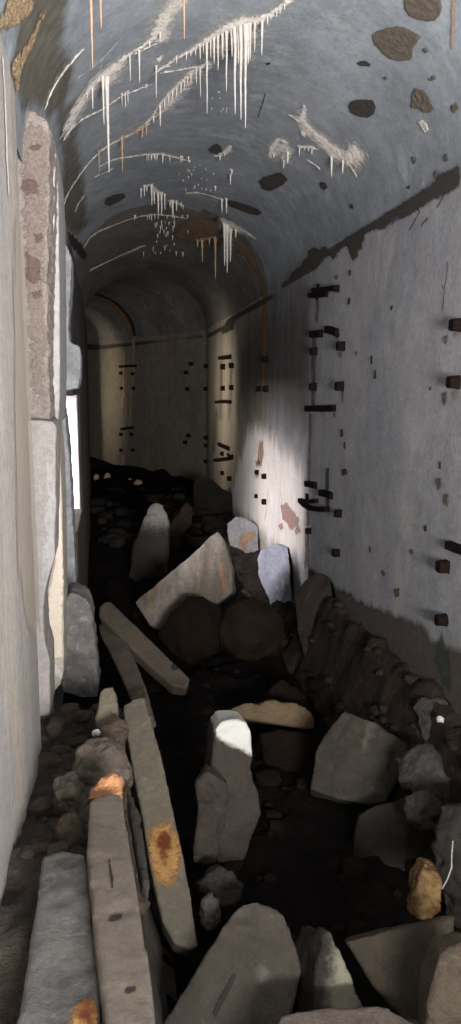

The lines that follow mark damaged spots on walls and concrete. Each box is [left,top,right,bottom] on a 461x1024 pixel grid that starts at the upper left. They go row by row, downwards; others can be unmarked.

spalling [372,0,442,61]
spalling [348,99,376,118]
spalling [411,75,436,133]
damp [17,0,295,279]
damp [267,105,365,178]
spalling [258,173,288,191]
rust [174,218,267,386]
peeling [278,503,301,534]